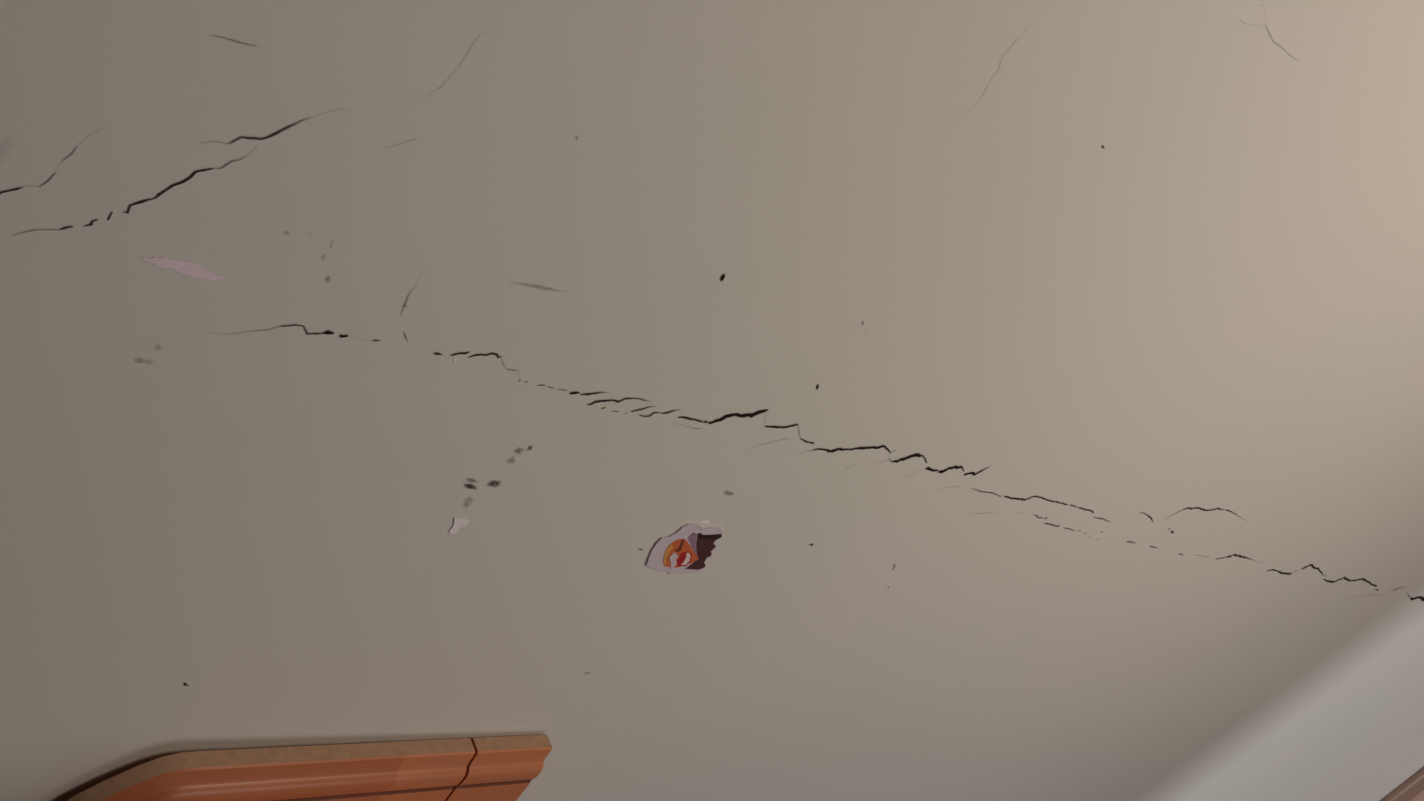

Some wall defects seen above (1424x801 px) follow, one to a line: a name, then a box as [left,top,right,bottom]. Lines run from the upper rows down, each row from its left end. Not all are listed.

crack [0,146,78,194]
crack [35,121,301,230]
crack [281,300,1237,548]
crack [1218,554,1424,601]